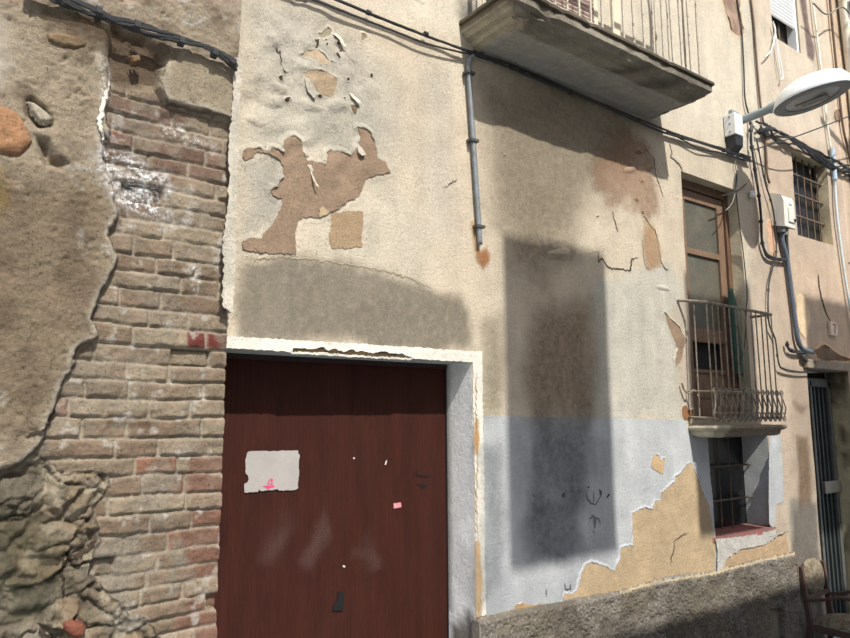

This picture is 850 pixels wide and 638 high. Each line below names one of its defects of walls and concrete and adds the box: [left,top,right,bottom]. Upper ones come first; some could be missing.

efflorescence [97,140,170,219]
leakage [497,96,656,264]
crack [640,141,682,199]
corrosion [473,222,489,266]
crack [596,215,669,274]
leakage [645,225,660,266]
spalling [0,24,413,638]
leakage [239,256,469,349]
peeling [663,310,689,371]
spalling [813,342,850,363]
peeling [562,452,789,601]